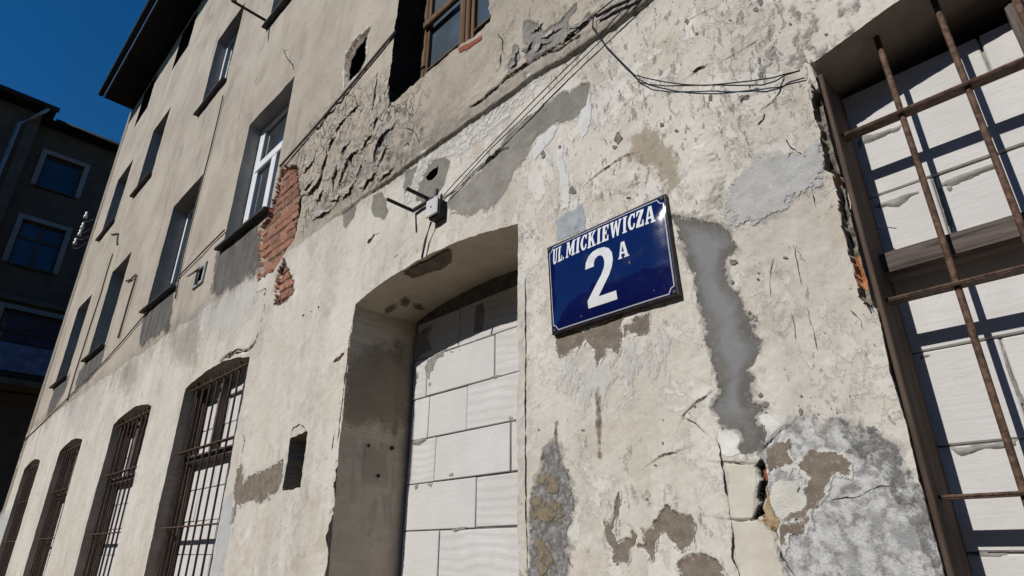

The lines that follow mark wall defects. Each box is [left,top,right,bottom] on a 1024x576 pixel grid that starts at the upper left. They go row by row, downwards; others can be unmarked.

flaking render [508,2,593,73]
flaking render [256,73,417,305]
leakage [403,71,569,216]
leakage [578,94,592,138]
flaking render [811,84,873,305]
flaking render [551,311,653,370]
flaking render [227,456,287,532]
flaking render [527,429,574,576]
flaking render [601,488,728,576]
crack [682,395,798,575]
flaking render [755,395,944,576]